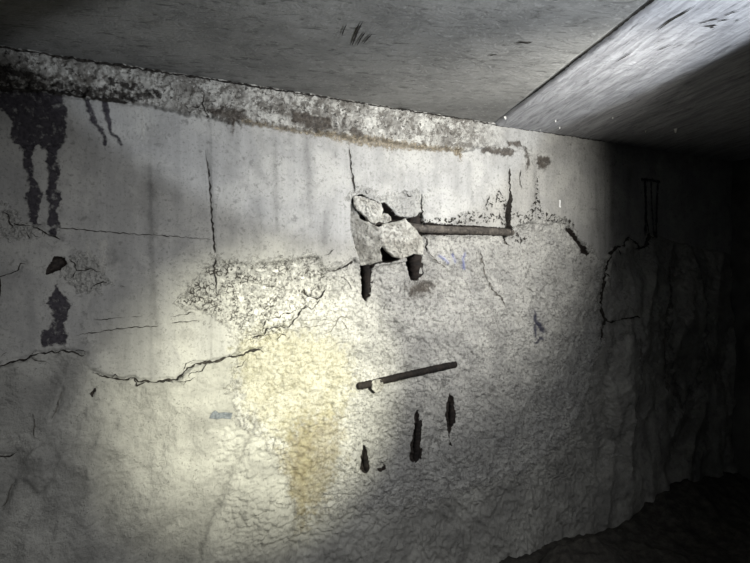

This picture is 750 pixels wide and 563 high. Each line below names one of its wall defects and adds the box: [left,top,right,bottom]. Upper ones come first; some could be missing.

leakage [0,63,161,236]
crack [0,150,353,387]
crack [480,253,505,304]
crack [486,169,522,245]
crack [599,213,658,341]
spalling [174,177,606,523]
rust [356,361,457,390]